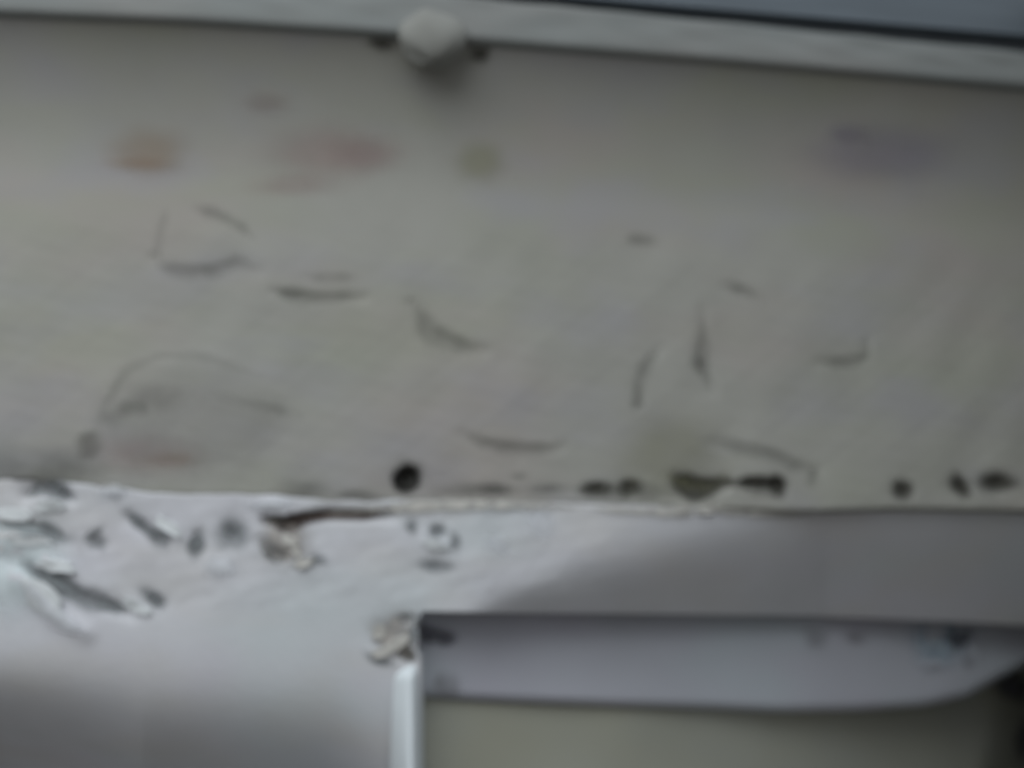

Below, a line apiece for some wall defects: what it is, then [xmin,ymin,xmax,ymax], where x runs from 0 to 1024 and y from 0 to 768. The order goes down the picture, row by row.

spalling [581,474,799,517]
spalling [894,483,911,498]
spalling [951,477,970,495]
spalling [983,475,1014,490]
peeling [0,483,162,630]
peeling [130,514,202,555]
spalling [262,527,319,569]
spalling [332,499,547,551]
spalling [371,616,417,664]